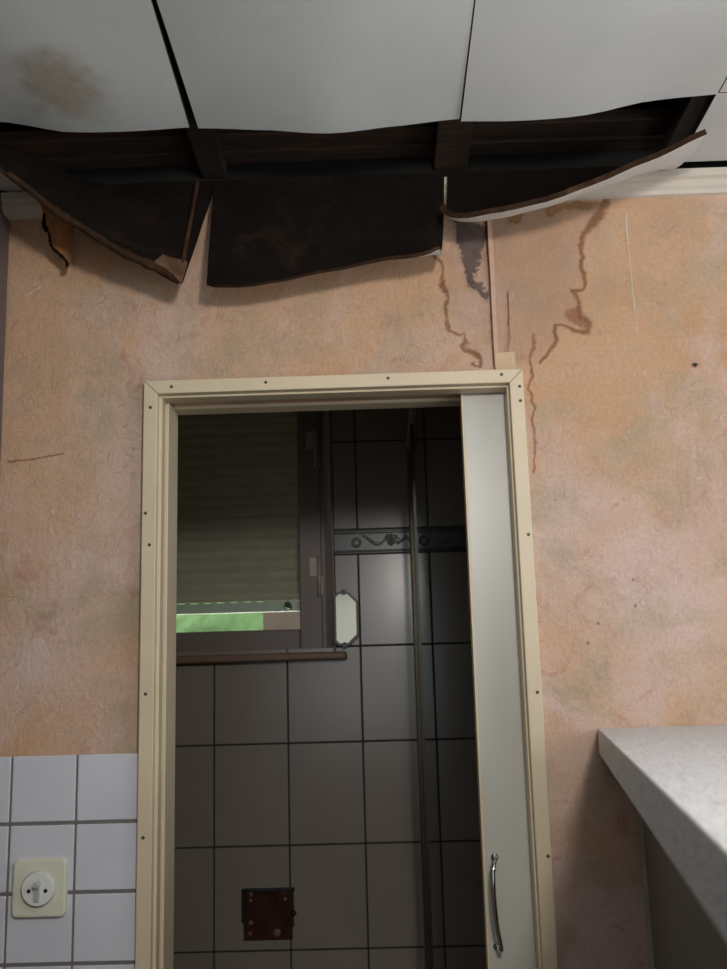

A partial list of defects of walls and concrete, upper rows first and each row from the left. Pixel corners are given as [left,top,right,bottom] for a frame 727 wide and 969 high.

leakage [433,255,482,367]
leakage [454,221,489,299]
leakage [527,199,609,473]